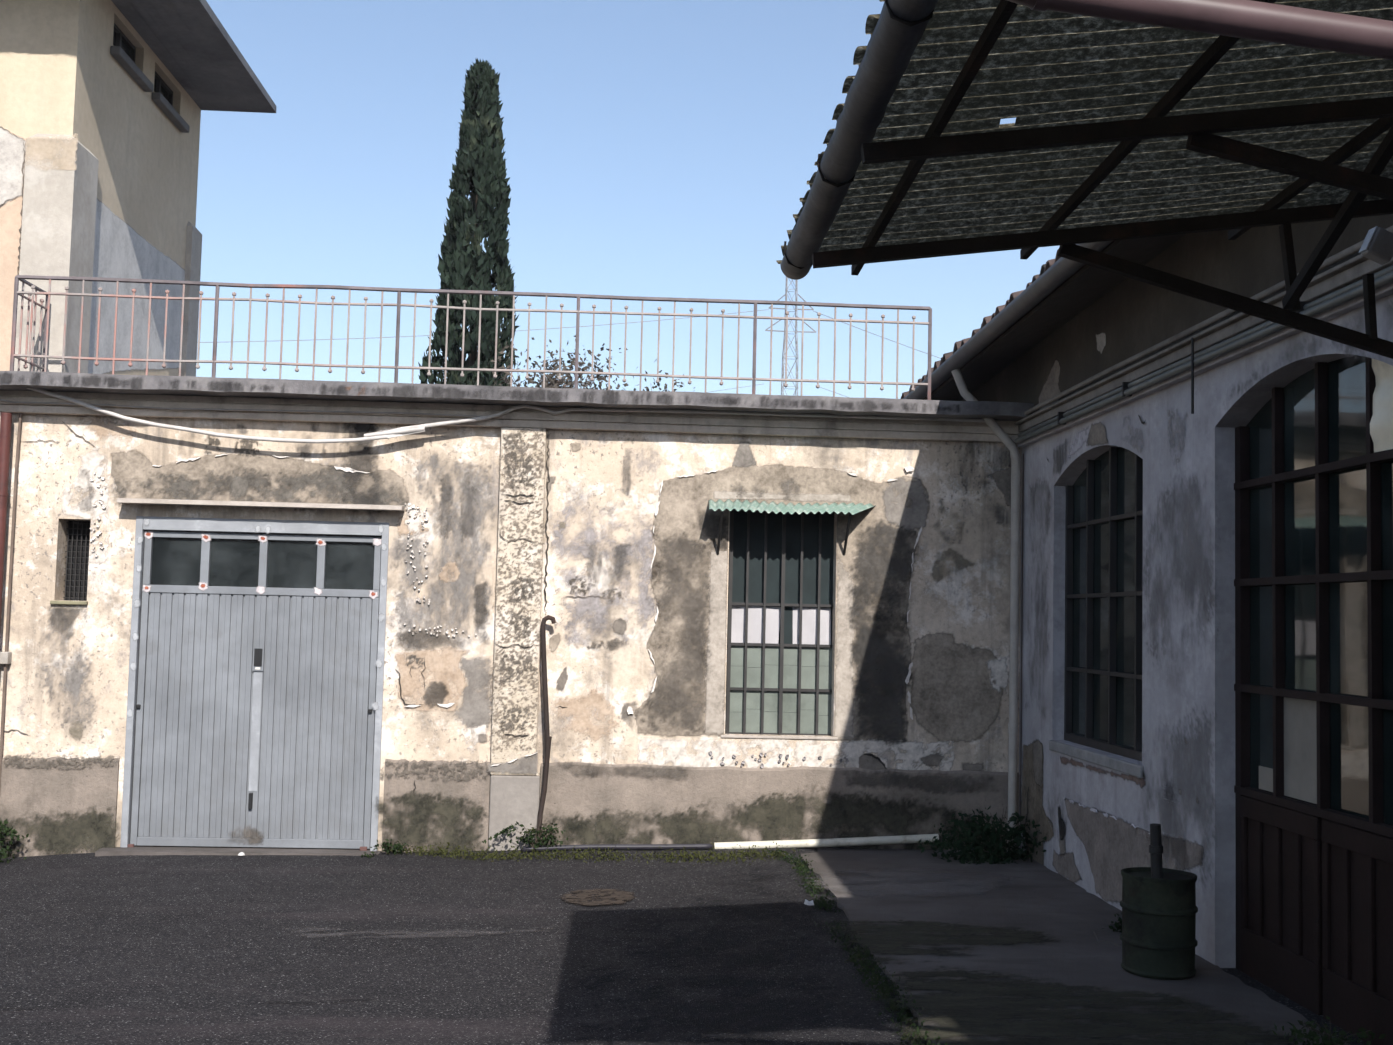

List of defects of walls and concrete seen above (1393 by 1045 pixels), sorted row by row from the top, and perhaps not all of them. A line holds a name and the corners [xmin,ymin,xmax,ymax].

peeling [381,429,545,781]
flaking render [556,464,1011,771]
damp [850,477,944,745]
damp [932,549,973,582]
flaking render [1020,740,1204,903]